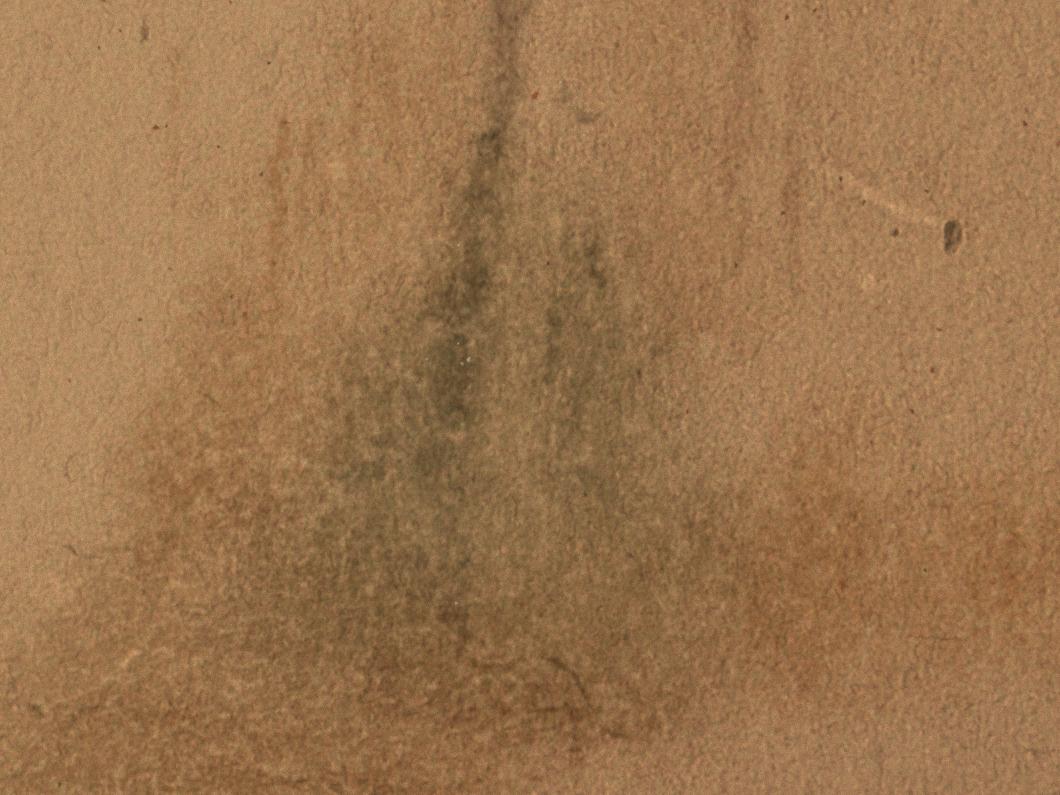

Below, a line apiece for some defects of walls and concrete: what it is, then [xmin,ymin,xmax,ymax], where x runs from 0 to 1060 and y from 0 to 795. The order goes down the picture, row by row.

water stain [75,0,822,663]